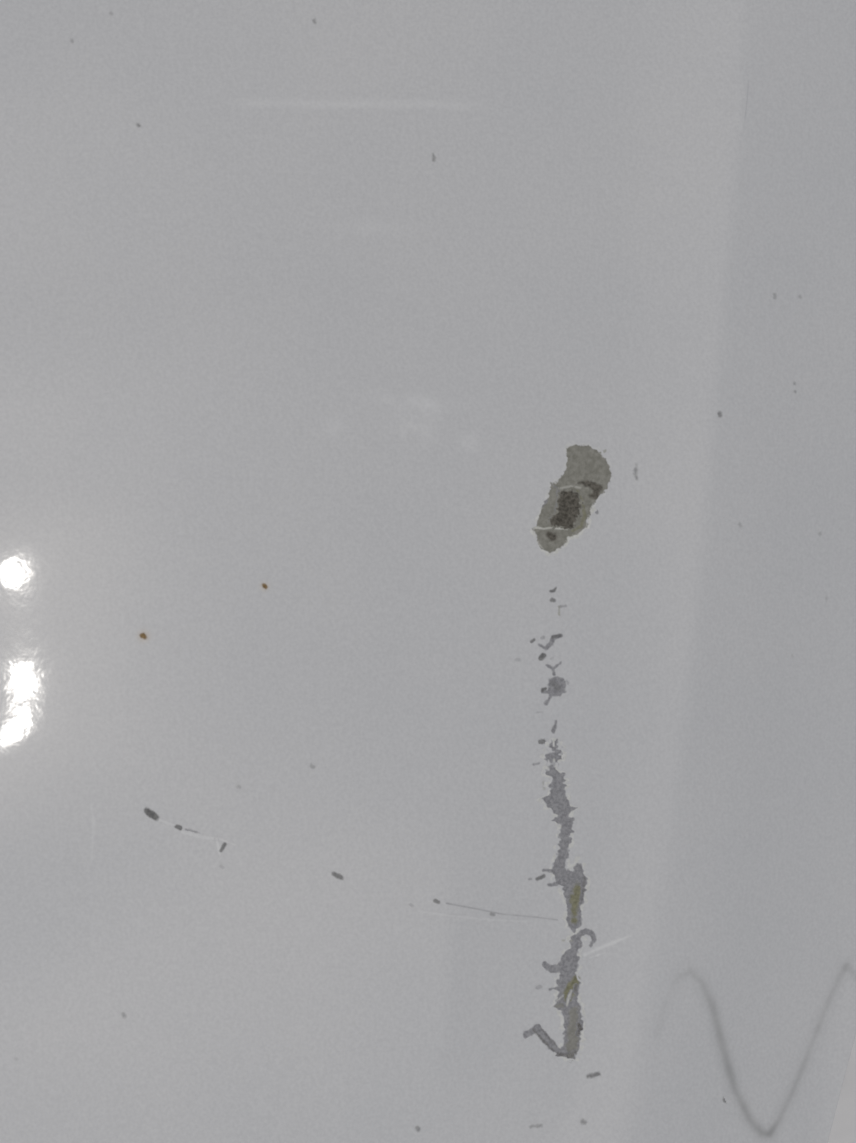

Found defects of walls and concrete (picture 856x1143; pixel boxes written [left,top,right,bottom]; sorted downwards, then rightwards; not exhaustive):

peeling [529,441,614,558]
peeling [529,632,564,662]
peeling [540,679,562,693]
peeling [527,733,602,1080]